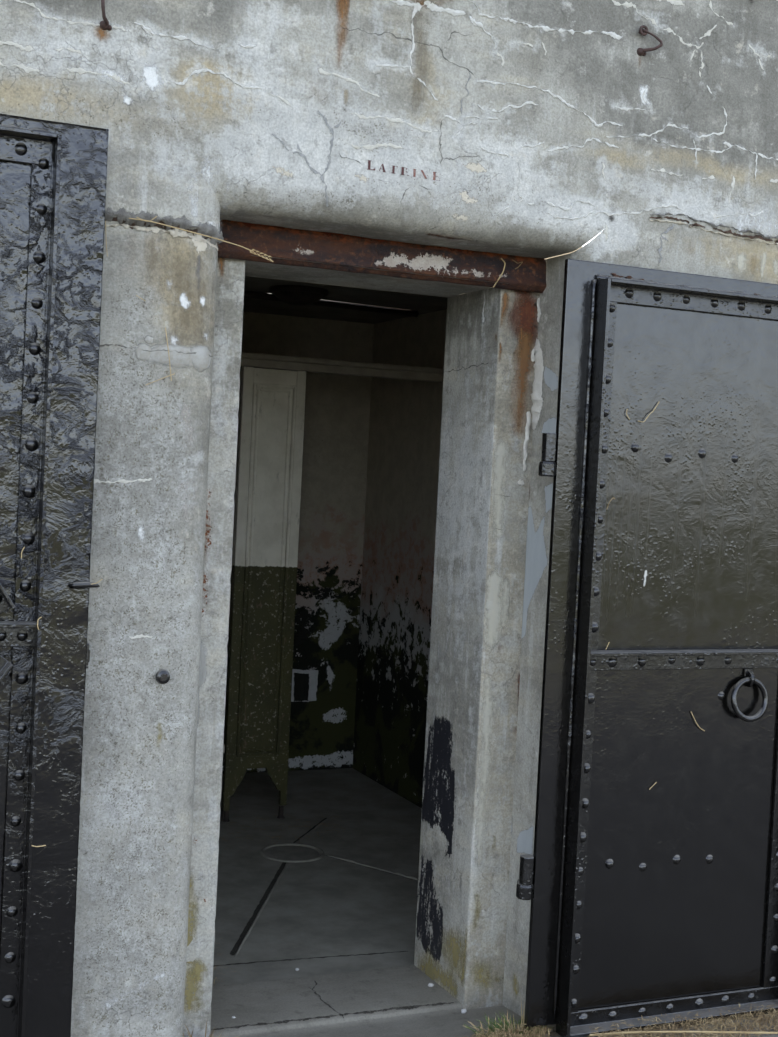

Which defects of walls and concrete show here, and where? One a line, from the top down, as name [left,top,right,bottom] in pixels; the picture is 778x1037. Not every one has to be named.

crack [0,0,293,108]
rust [337,0,349,56]
crack [272,0,778,263]
rust [242,222,388,243]
spalling [375,252,508,279]
spalling [180,293,205,309]
rust [502,290,538,431]
peeling [291,587,347,702]
peeling [322,707,347,724]
leakage [184,962,205,1010]